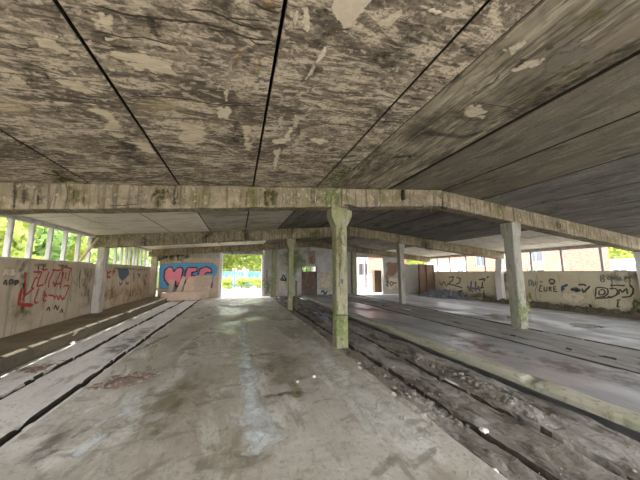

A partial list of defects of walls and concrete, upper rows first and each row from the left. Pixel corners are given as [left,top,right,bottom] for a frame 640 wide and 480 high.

peeling [331,0,372,28]
peeling [502,40,526,56]
peeling [305,47,327,80]
peeling [510,58,545,72]
peeling [216,89,232,119]
peeling [463,104,488,119]
peeling [272,115,332,171]